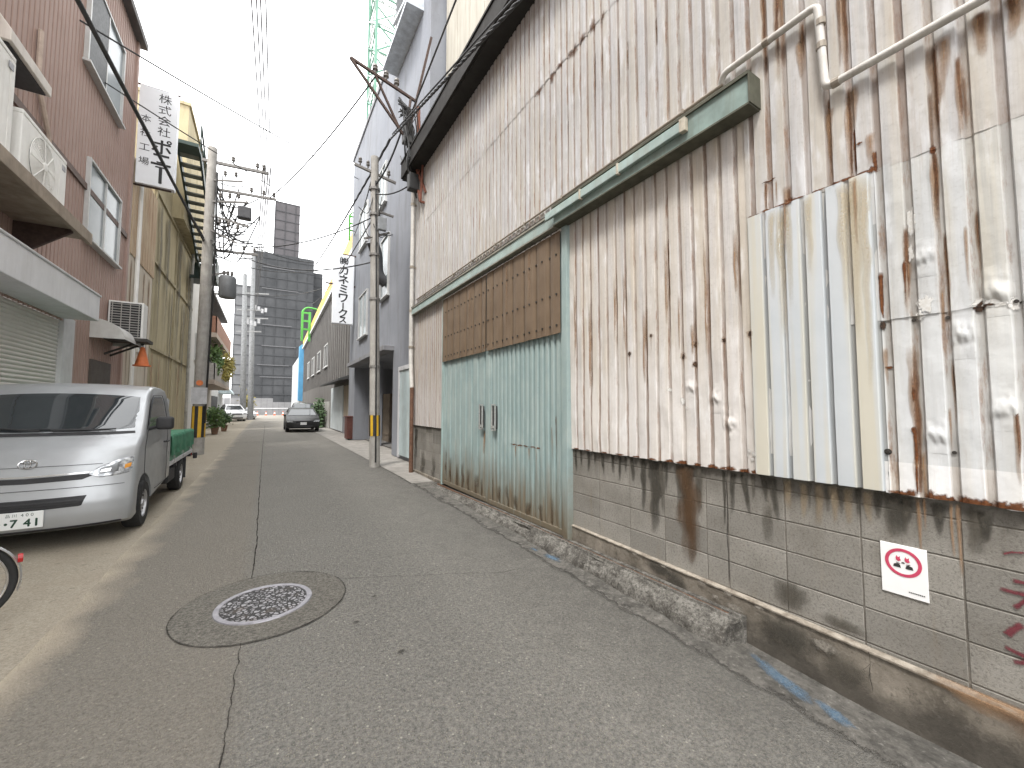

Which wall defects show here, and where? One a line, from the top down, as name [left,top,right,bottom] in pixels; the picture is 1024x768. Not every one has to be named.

corrosion [837,0,848,47]
corrosion [929,39,966,206]
corrosion [878,274,886,330]
corrosion [902,231,910,296]
corrosion [941,237,950,321]
corrosion [574,448,756,544]
damp [722,471,778,520]
damp [874,492,912,529]
damp [932,504,945,529]
crack [166,428,390,768]
damp [649,561,685,588]
damp [830,618,858,635]